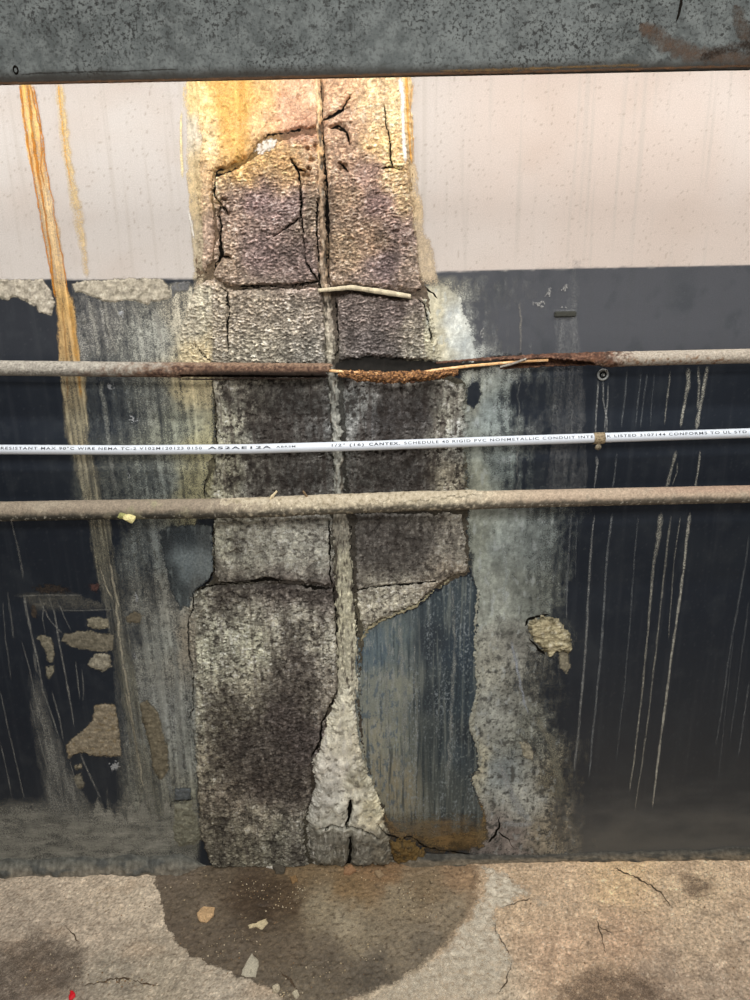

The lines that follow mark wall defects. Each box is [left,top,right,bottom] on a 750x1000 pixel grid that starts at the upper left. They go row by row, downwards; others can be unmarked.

peeling [0,279,55,316]
crack [195,80,350,497]
rust [0,5,750,361]
crack [381,106,403,171]
rust [61,376,99,500]
spalling [66,703,121,789]
rust [91,520,142,782]
water stain [0,77,579,1000]
crack [187,516,436,757]
peeling [355,574,484,834]
spalling [525,614,573,674]
water stain [666,520,689,695]